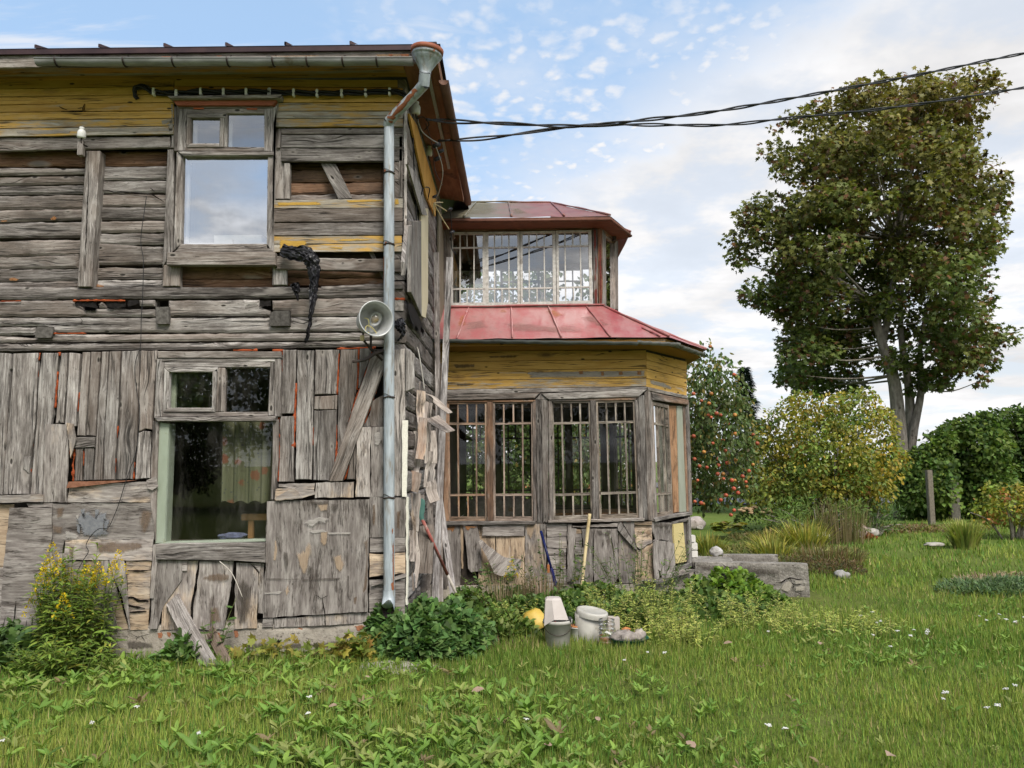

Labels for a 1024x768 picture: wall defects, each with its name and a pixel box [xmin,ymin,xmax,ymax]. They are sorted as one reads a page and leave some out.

peeling [280,240,306,248]
peeling [487,371,672,389]